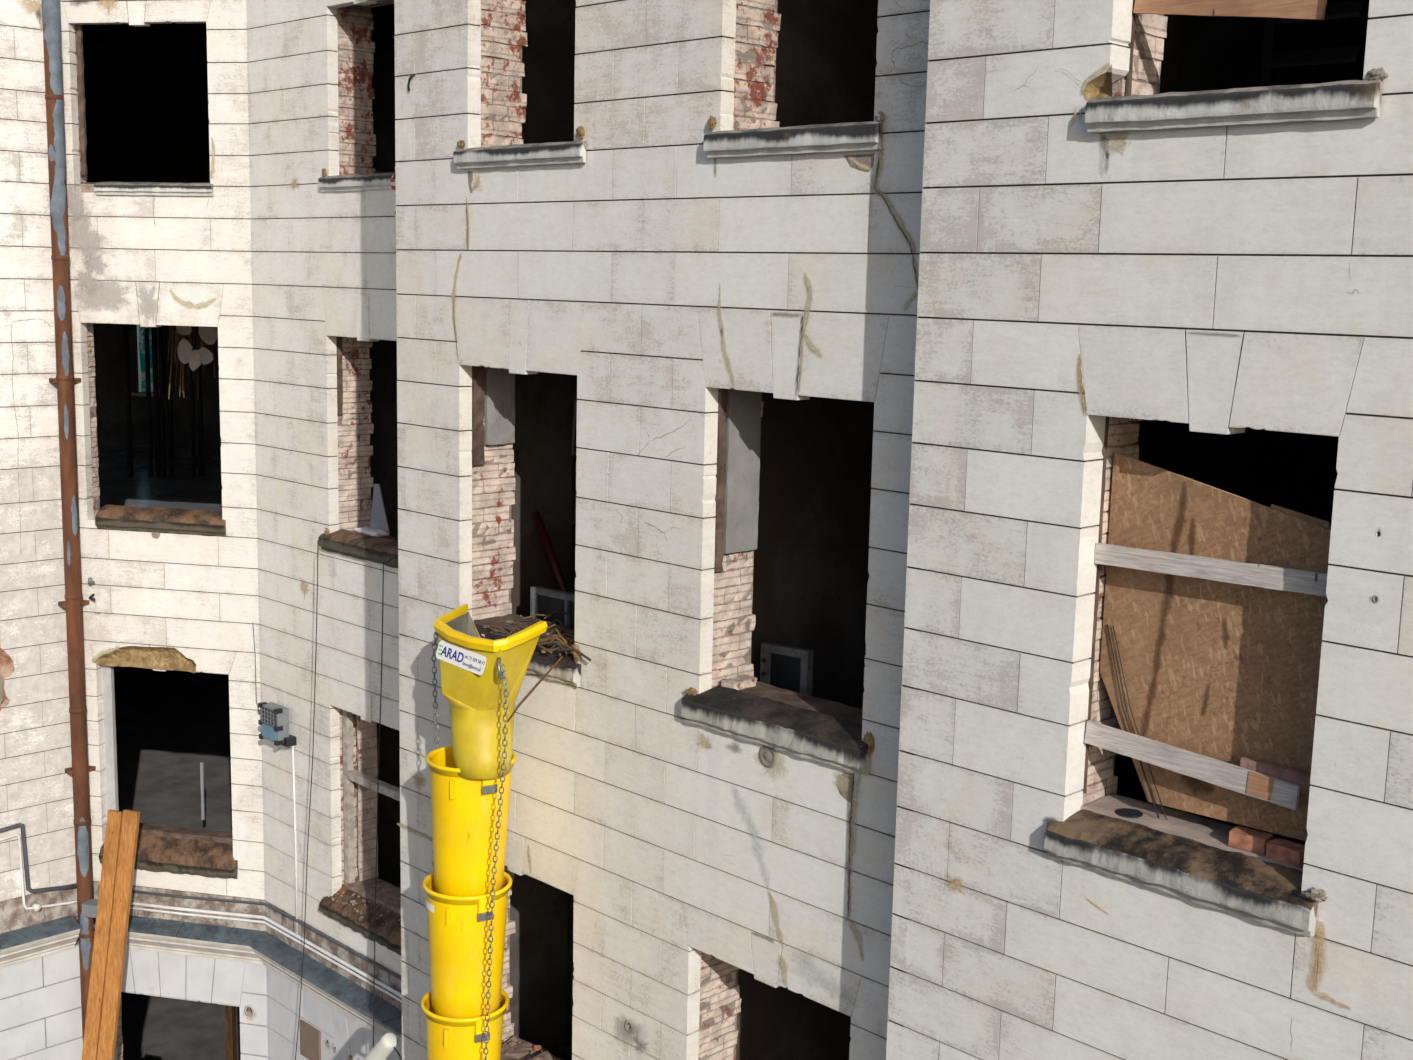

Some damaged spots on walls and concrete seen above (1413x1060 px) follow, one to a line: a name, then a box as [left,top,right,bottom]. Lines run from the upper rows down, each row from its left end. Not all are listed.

spalling [1060,64,1112,123]
crack [452,198,469,355]
crack [872,150,919,309]
spalling [0,648,15,711]
spalling [92,646,196,673]
crack [847,774,860,919]